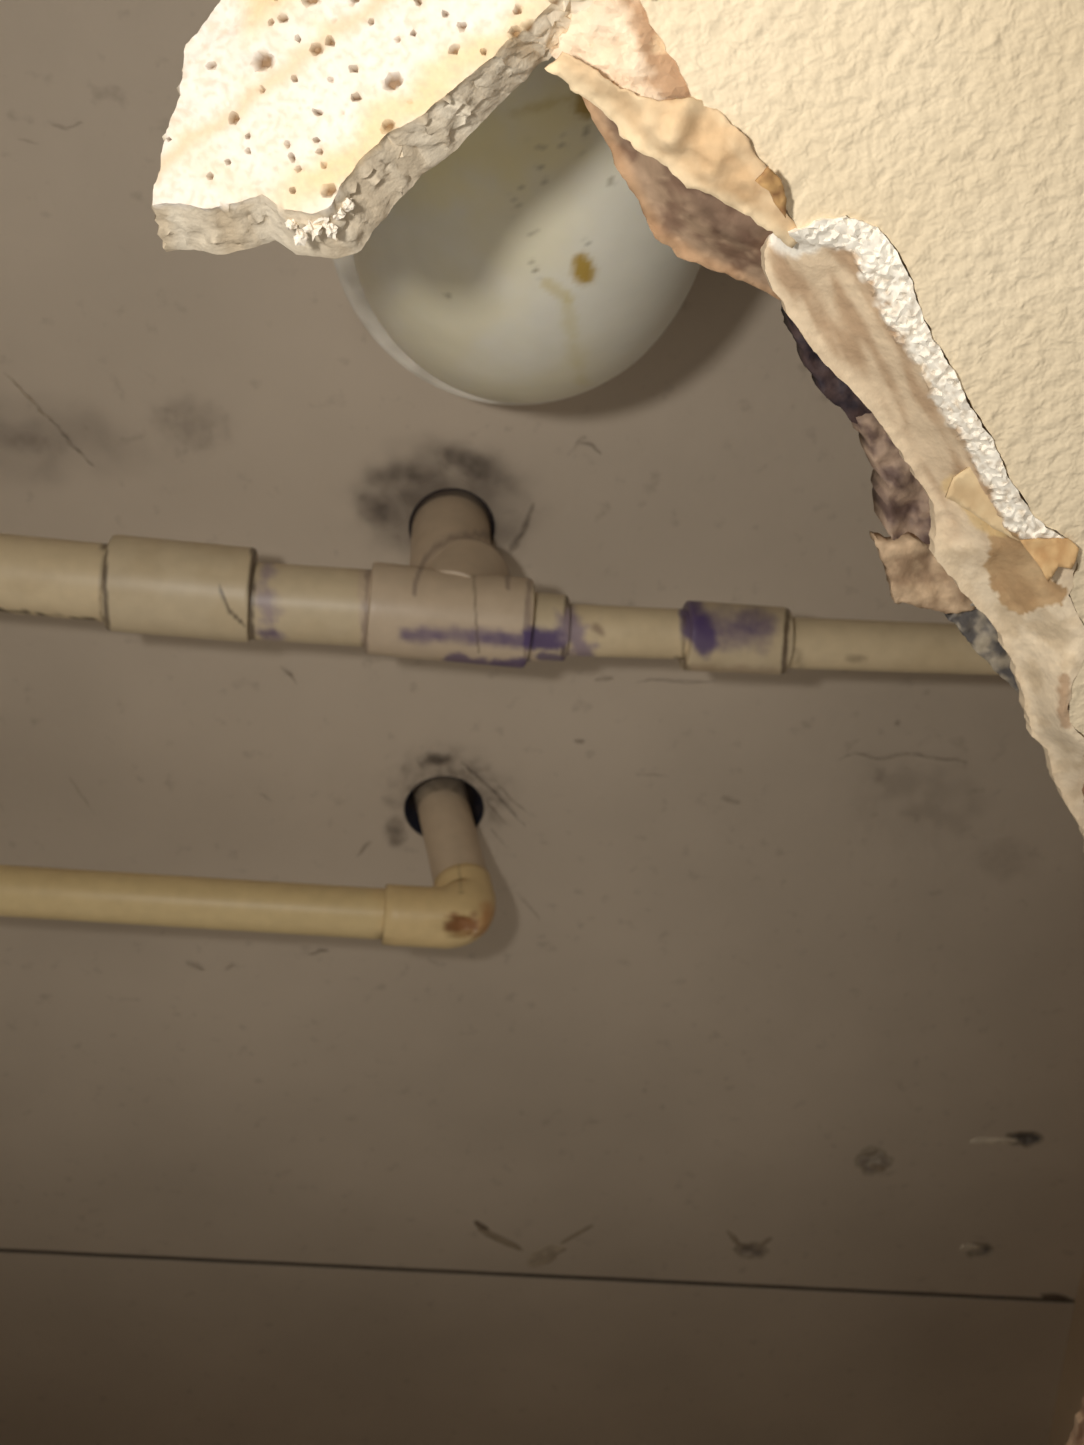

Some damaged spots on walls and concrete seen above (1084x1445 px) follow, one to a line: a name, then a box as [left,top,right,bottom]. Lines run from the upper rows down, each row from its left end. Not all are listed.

spalling [760,215,1084,837]
spalling [1066,1397,1084,1445]